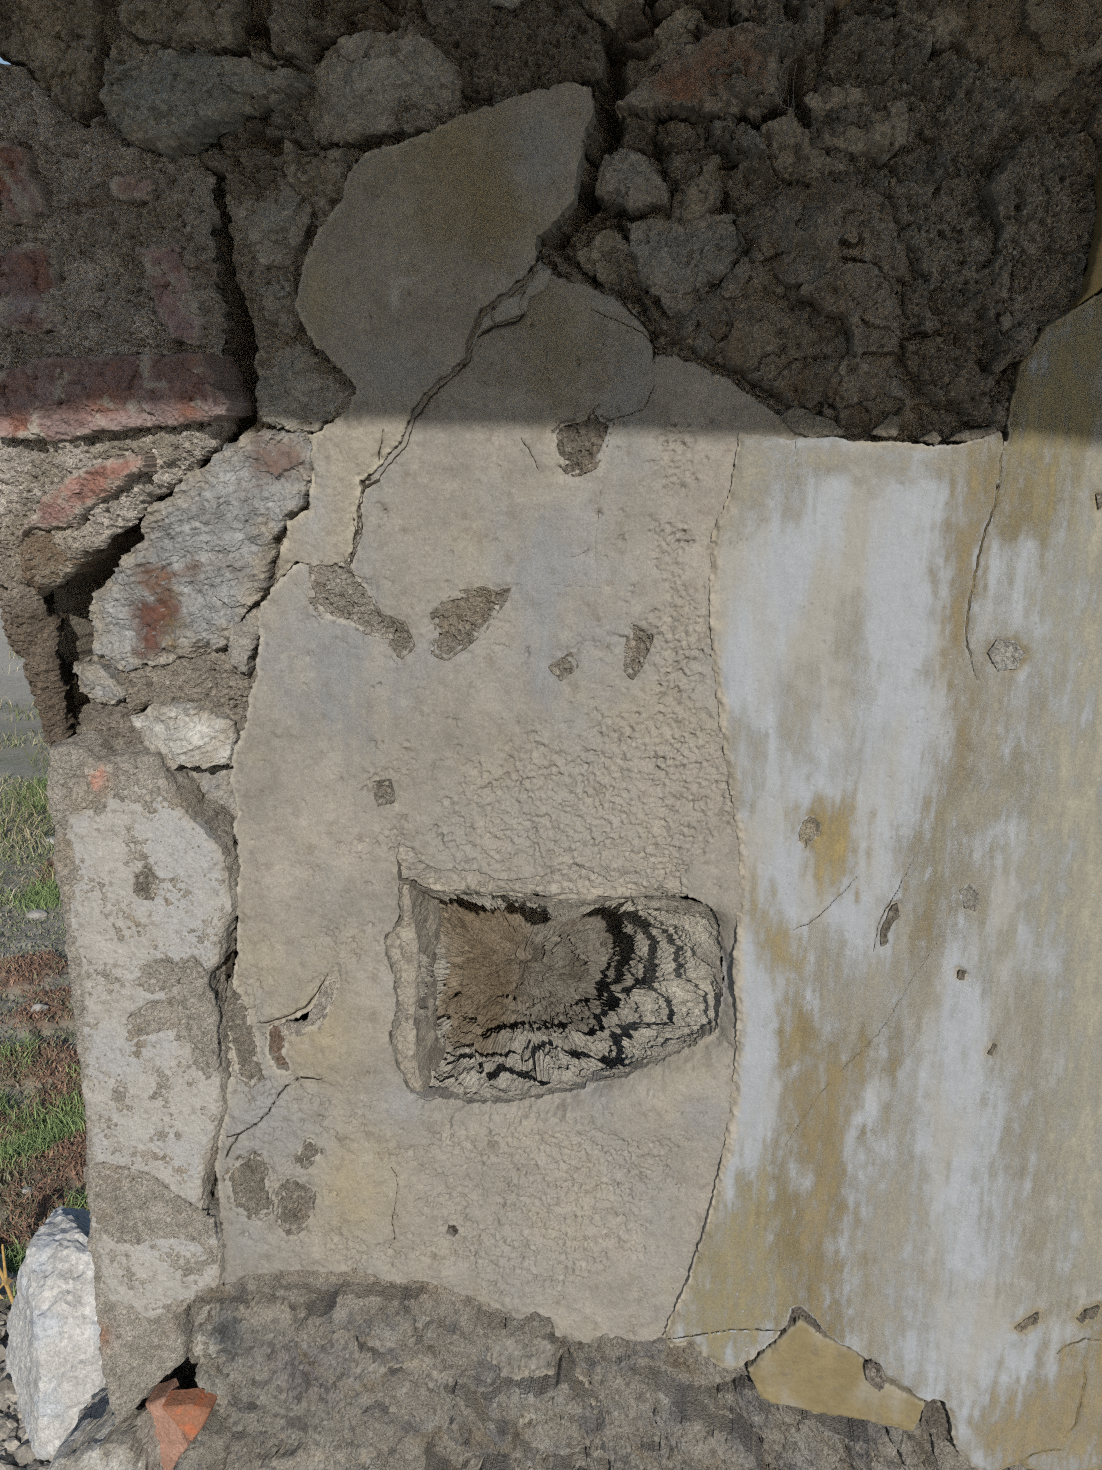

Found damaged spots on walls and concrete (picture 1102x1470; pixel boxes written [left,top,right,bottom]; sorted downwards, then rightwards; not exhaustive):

spalling [815,14,1102,445]
flaking render [276,81,596,661]
crack [350,255,540,564]
spalling [551,404,615,477]
crack [966,433,1005,679]
crack [223,936,237,993]
water stain [686,298,1102,1394]
crack [213,1076,322,1196]
flaking render [747,1306,953,1441]
water stain [971,1320,1102,1470]